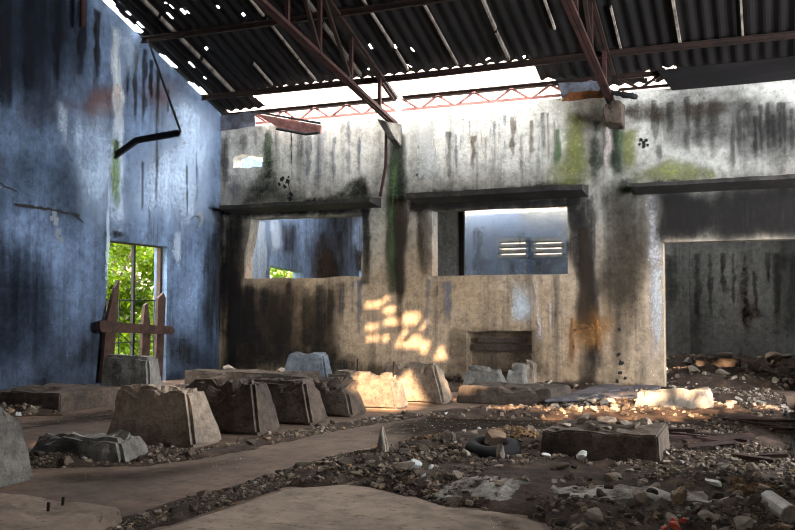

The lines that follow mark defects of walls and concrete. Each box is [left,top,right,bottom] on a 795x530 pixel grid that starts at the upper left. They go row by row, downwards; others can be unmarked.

water stain [74,10,101,82]
water stain [76,30,199,270]
water stain [463,114,516,165]
water stain [753,104,793,151]
crack [0,183,84,223]
water stain [388,150,409,328]
water stain [765,253,795,305]